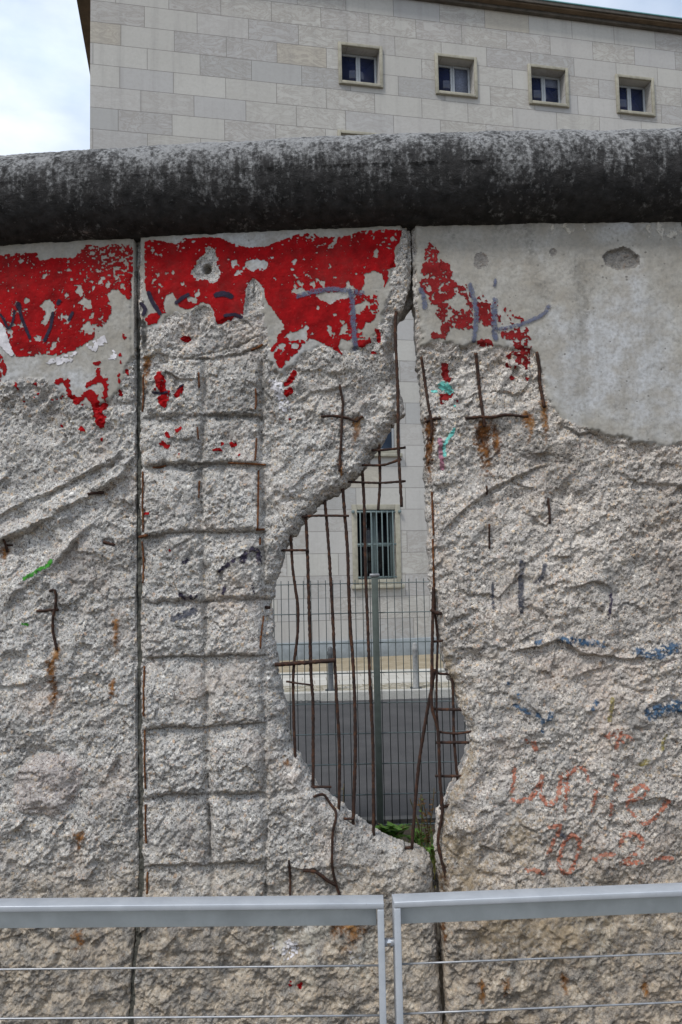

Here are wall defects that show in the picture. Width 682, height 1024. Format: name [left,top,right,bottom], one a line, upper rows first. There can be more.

corrosion [424,417,435,483]
corrosion [473,420,501,476]
corrosion [523,401,548,439]
spalling [0,227,682,1024]
corrosion [45,648,60,706]